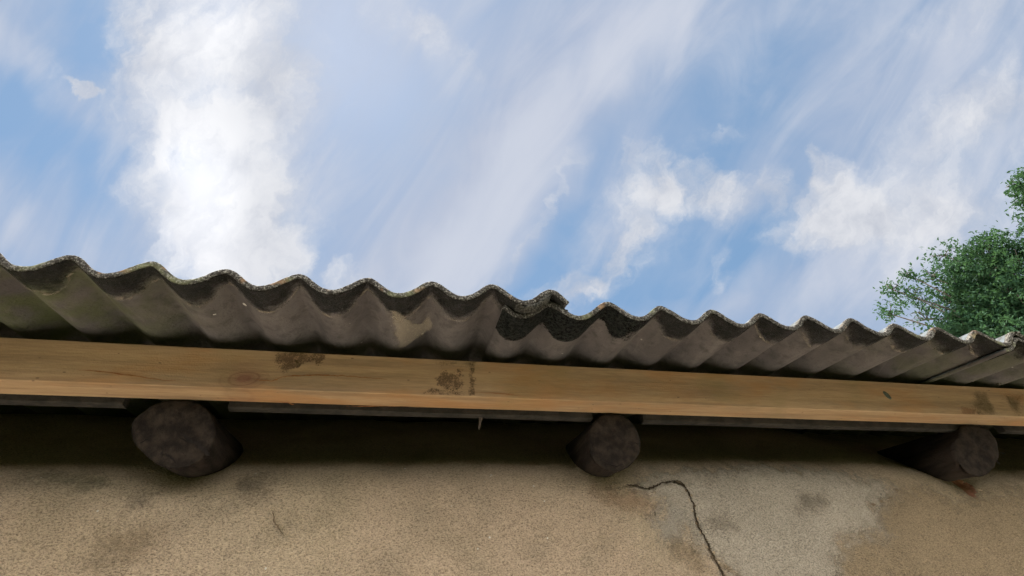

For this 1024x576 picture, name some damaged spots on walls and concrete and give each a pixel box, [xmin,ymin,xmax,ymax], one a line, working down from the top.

crack [626,480,726,576]